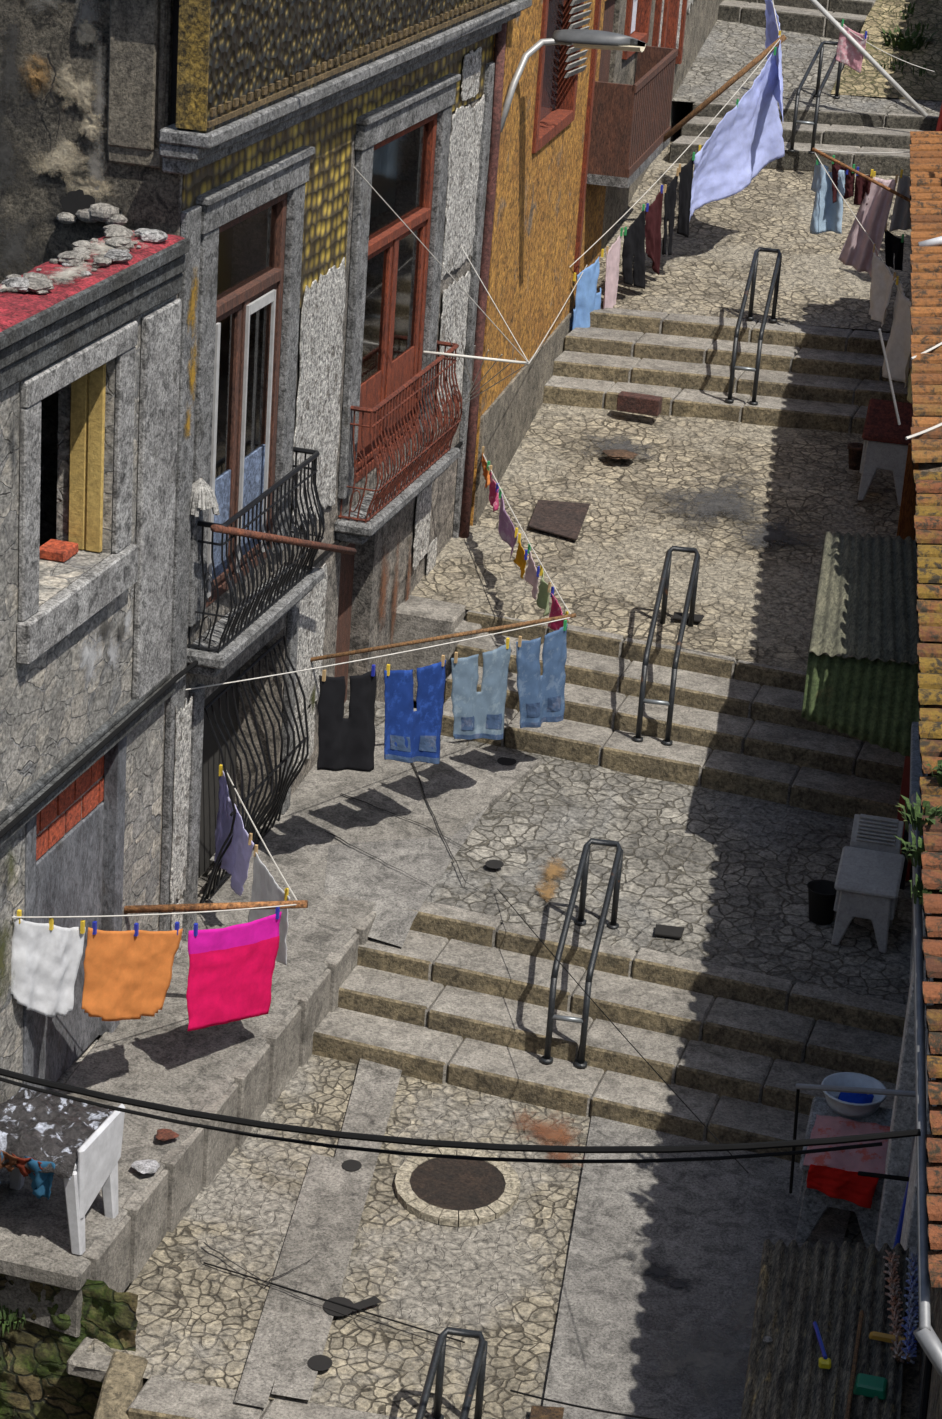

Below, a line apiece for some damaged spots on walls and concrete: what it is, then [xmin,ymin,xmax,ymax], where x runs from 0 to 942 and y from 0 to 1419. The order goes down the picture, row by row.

flaking render [76,19,98,46]
spalling [32,64,136,280]